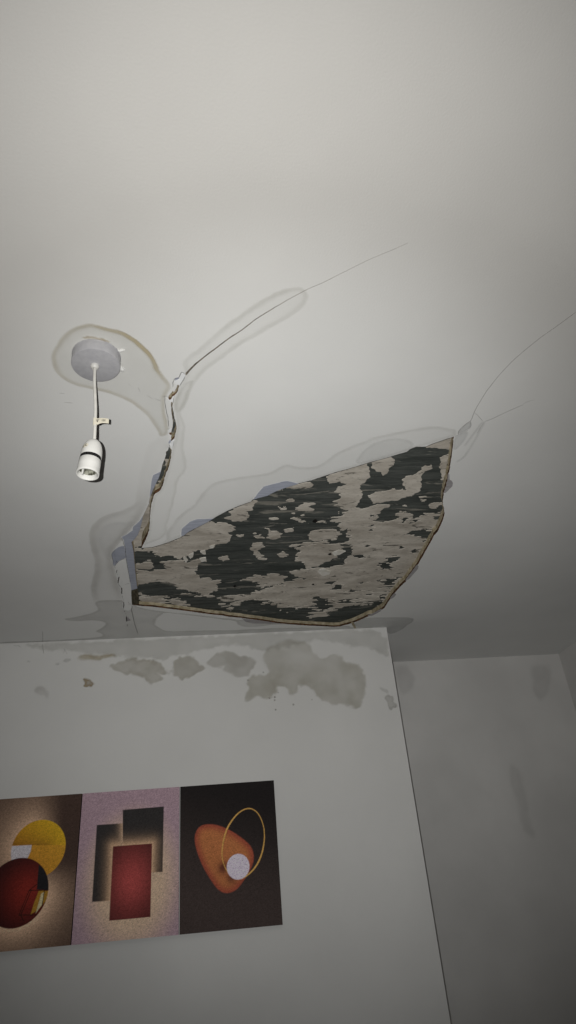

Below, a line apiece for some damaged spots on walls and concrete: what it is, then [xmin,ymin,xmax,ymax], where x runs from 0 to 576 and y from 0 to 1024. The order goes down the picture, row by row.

water stain [99,327,159,372]
crack [122,243,407,590]
spalling [111,437,454,633]